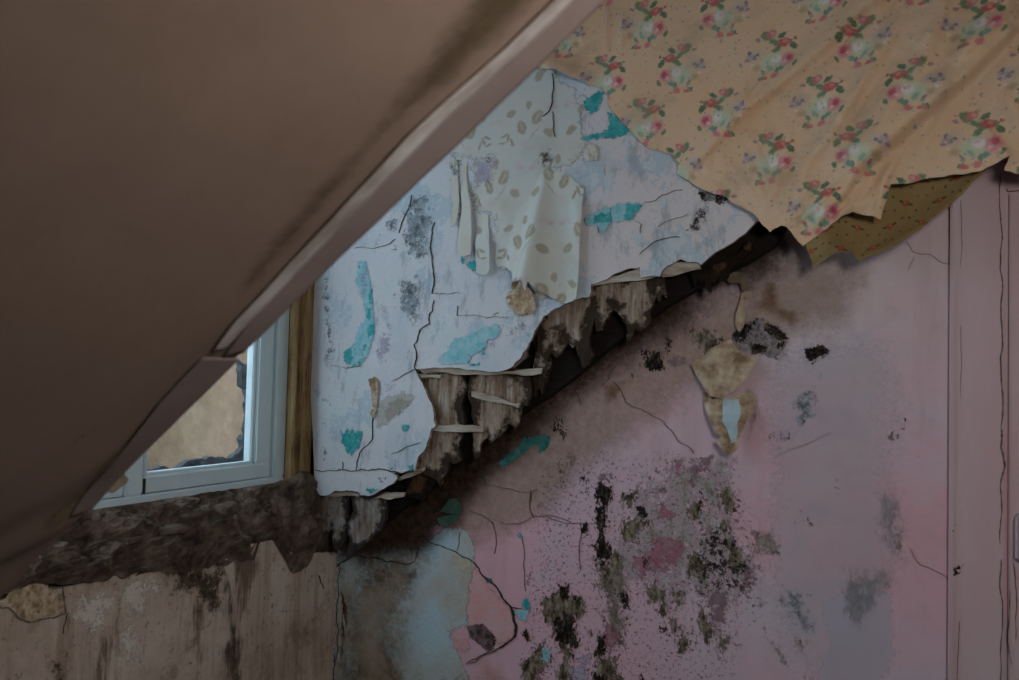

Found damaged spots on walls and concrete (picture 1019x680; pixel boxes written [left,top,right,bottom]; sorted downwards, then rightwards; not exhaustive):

crack [356,195,412,249]
leakage [386,196,431,258]
spalling [698,189,727,205]
crack [391,222,509,381]
peeling [368,376,378,418]
leakage [339,242,841,680]
leakage [168,552,257,680]
spalling [0,471,531,680]
crack [333,479,590,680]